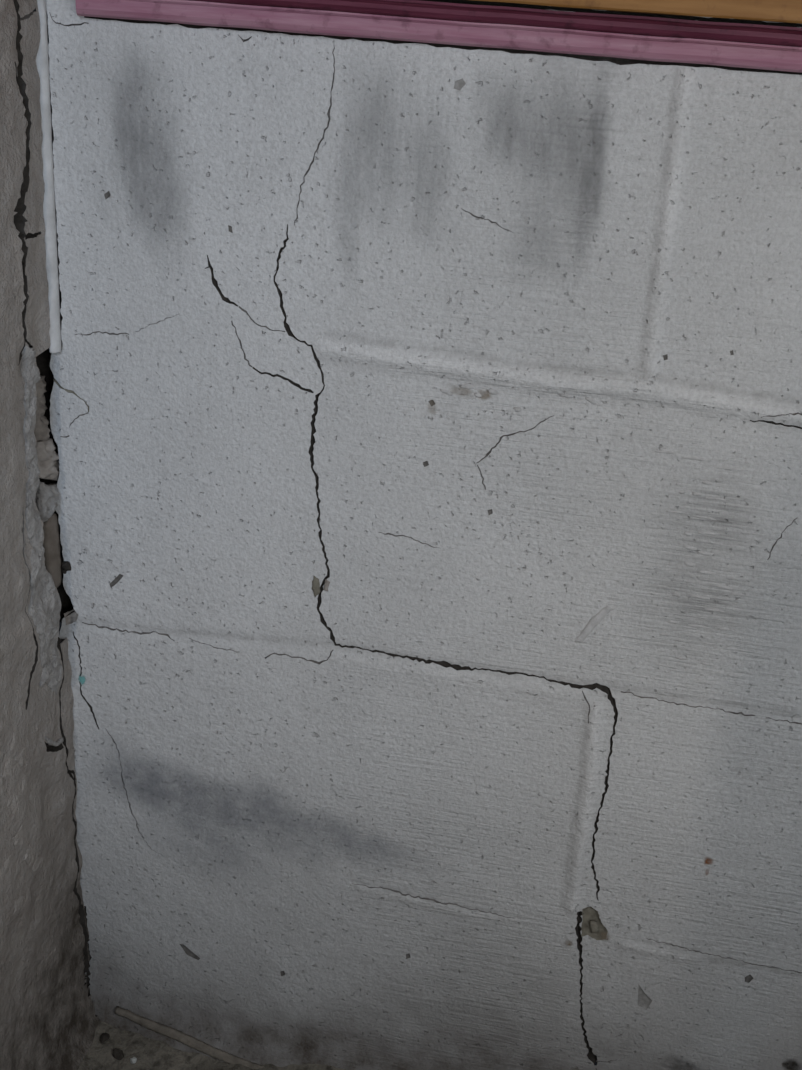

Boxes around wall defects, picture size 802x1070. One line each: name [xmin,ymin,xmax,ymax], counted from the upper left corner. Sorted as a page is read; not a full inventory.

crack [13,0,177,366]
flaking render [19,346,89,695]
crack [205,46,802,1070]